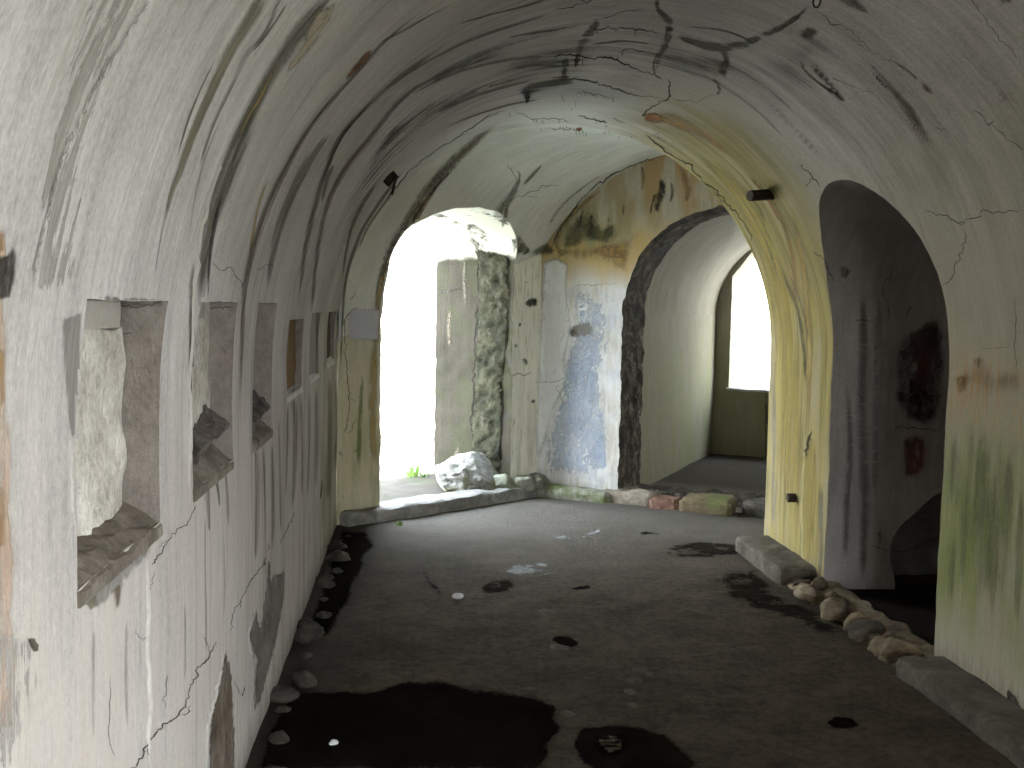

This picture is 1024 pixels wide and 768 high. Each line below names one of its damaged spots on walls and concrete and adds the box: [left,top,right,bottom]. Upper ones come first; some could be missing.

rust [347,51,371,78]
crack [388,0,753,247]
rust [644,114,725,152]
crack [928,209,1018,284]
peeling [537,260,606,472]
leakage [897,322,944,423]
crack [108,508,294,768]
flaking render [247,562,285,709]
flaking render [205,653,235,768]